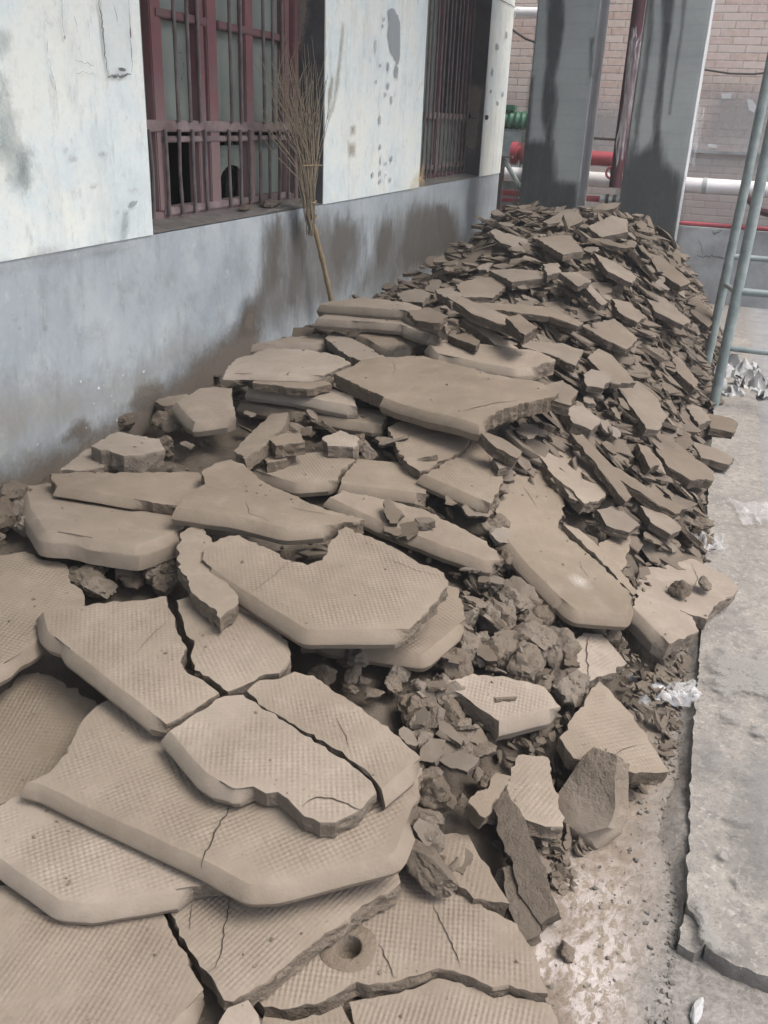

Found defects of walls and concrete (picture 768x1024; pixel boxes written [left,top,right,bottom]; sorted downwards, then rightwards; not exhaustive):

peeling [375,8,400,104]
damp [516,0,577,209]
damp [618,0,681,243]
damp [256,221,359,321]
damp [364,208,462,285]